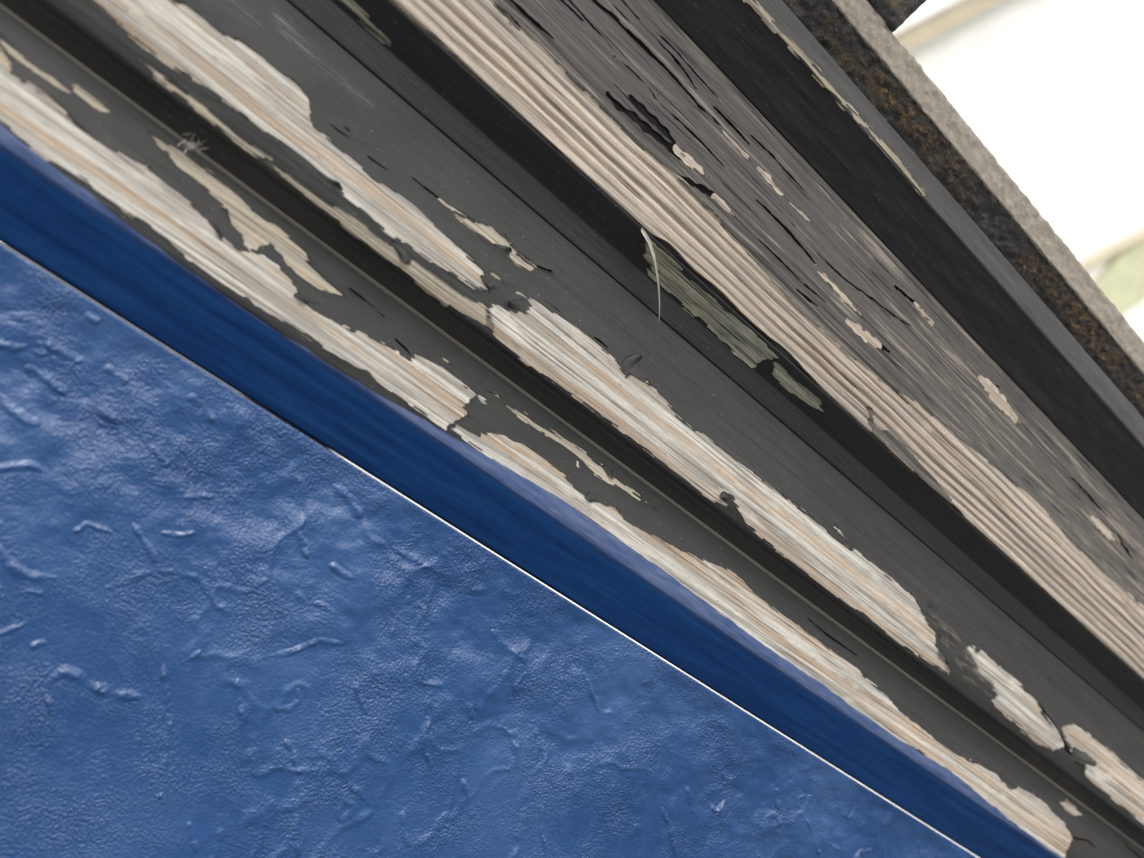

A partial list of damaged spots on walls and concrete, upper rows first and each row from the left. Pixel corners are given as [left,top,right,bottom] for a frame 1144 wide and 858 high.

peeling [0,39,487,430]
peeling [95,0,1144,679]
peeling [451,423,1073,858]
peeling [966,645,1144,824]